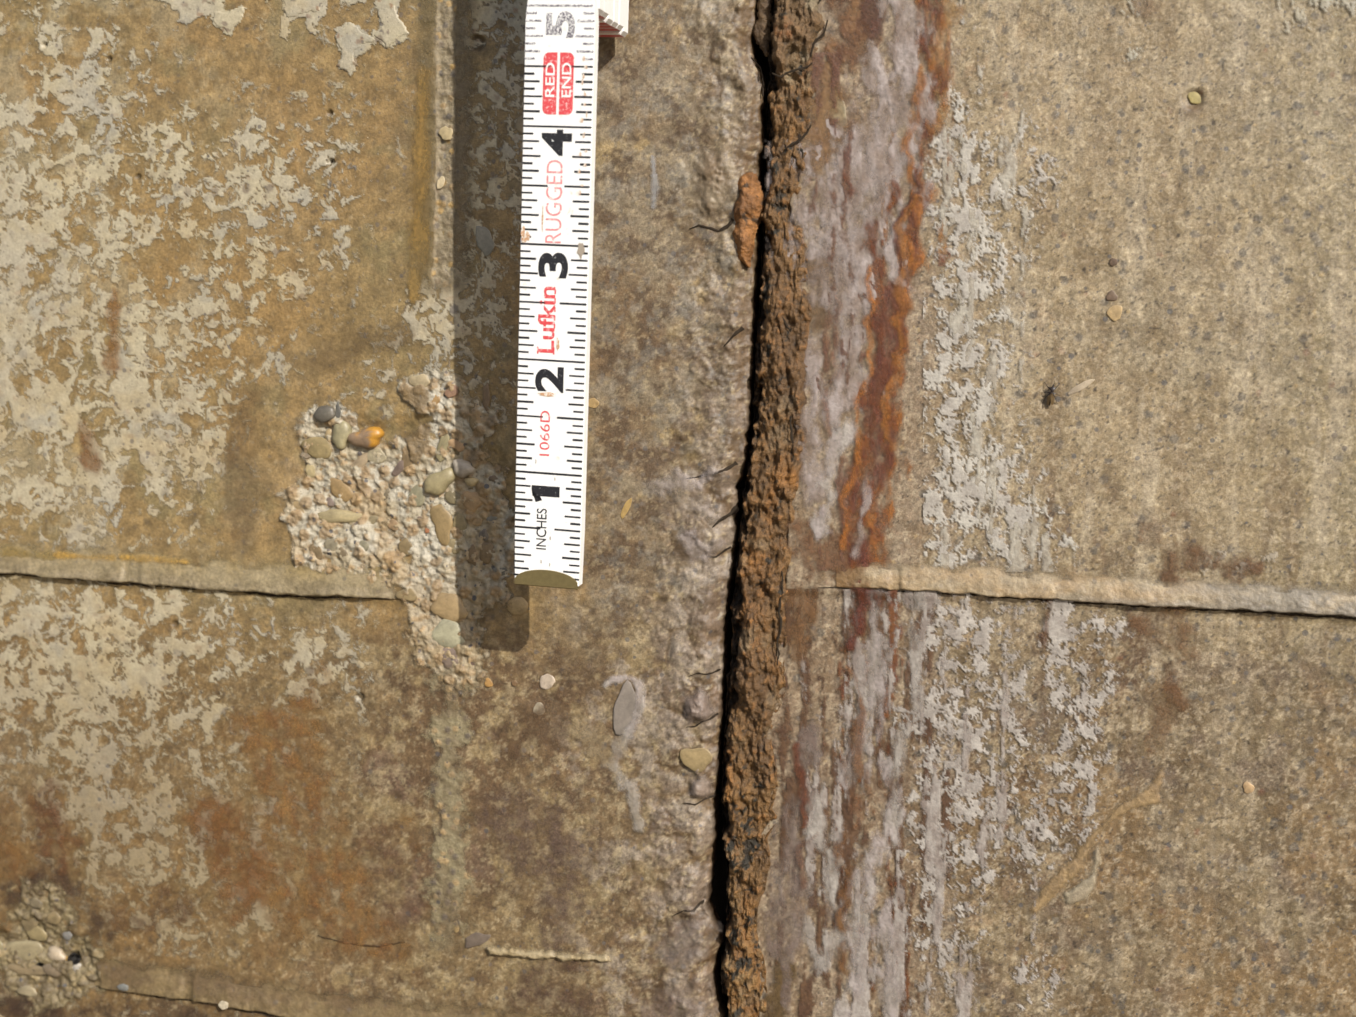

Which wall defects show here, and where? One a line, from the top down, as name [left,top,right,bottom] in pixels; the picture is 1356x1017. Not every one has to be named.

crack [0,573,377,599]
peeling [0,573,396,1017]
peeling [0,0,416,557]
spalling [275,0,528,695]
crack [673,385,756,1011]
crack [751,0,828,198]
corrosion [793,744,808,889]
corrosion [833,0,957,973]
corrosion [896,952,910,1017]
water stain [783,0,1078,572]
water stain [765,588,1134,1017]
crack [897,590,1356,620]